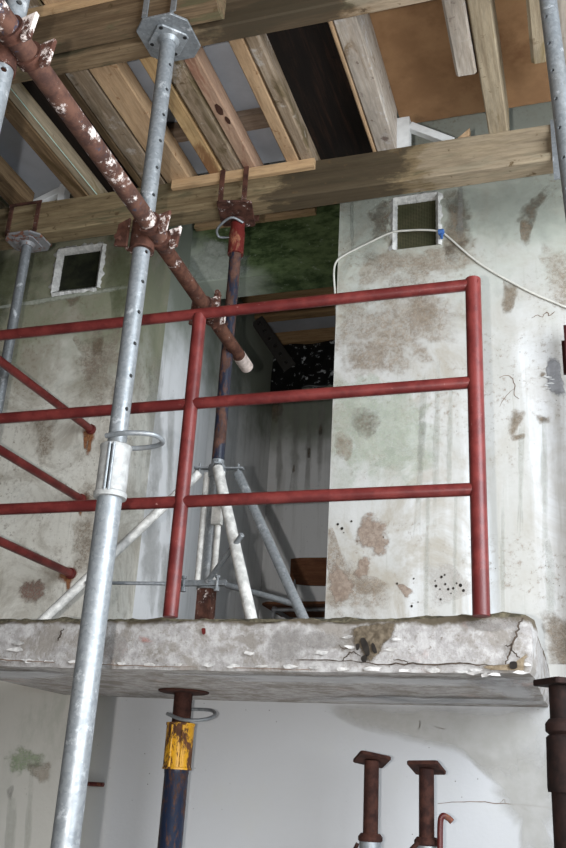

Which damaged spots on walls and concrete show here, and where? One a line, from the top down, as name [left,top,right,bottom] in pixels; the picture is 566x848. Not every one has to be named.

damp [520,221,531,241]
peeling [1,641,34,663]
crack [0,657,75,665]
crack [102,661,192,669]
spalling [273,622,402,671]
crack [232,618,524,670]
damp [214,675,552,848]